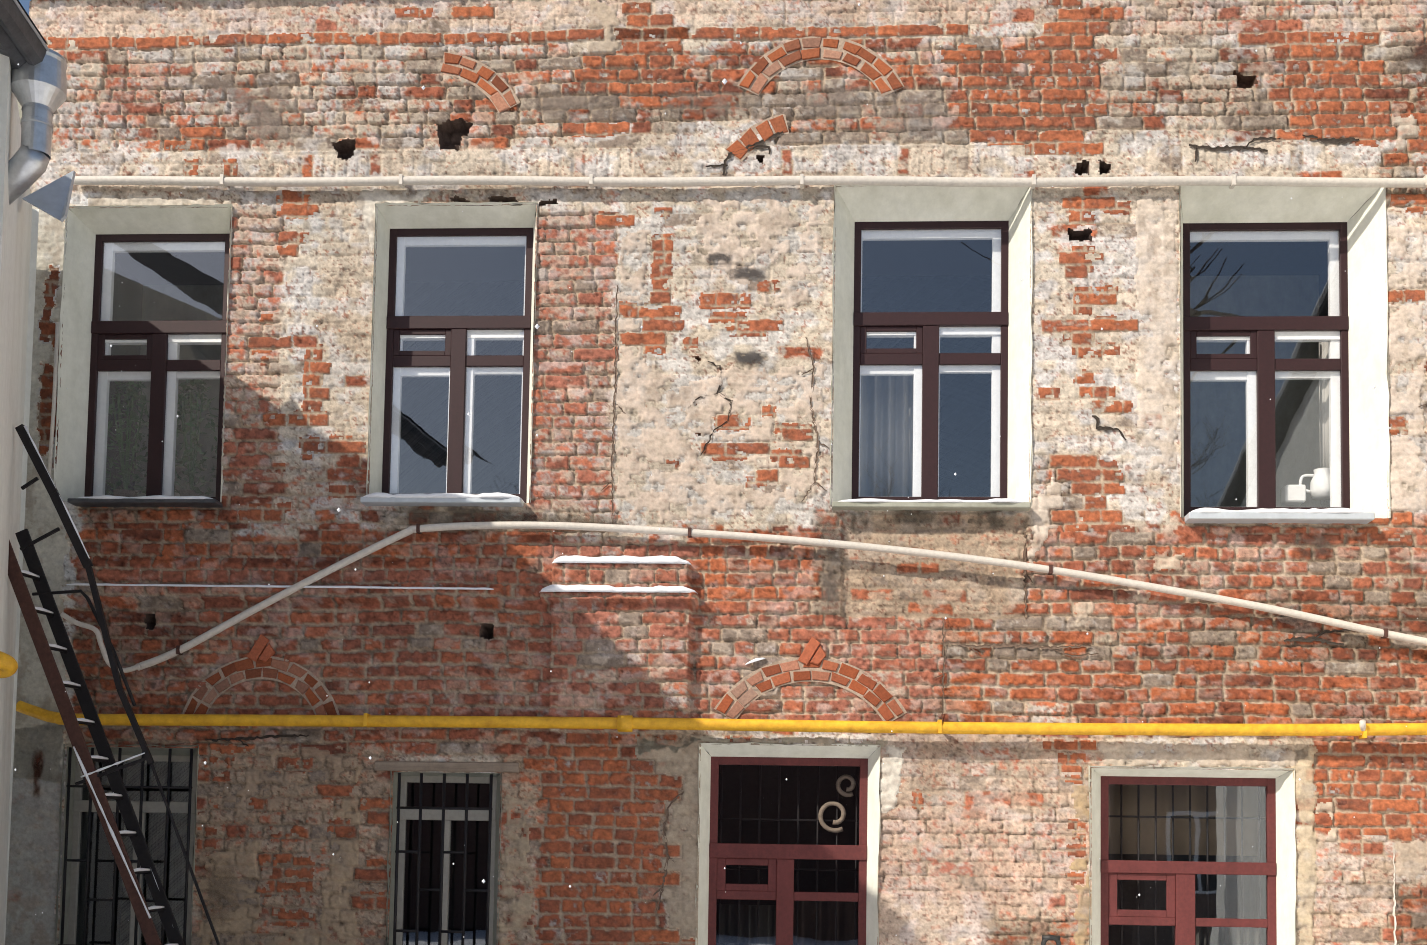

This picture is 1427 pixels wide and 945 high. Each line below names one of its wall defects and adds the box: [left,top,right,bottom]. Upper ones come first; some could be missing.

spalling [276,190,319,257]
spalling [47,0,1124,177]
crack [706,131,783,175]
crack [1189,135,1359,162]
spalling [1237,31,1427,154]
spalling [248,314,367,460]
flaking render [596,193,827,524]
crack [690,361,733,456]
crack [801,337,829,502]
flaking render [1038,195,1181,470]
spalling [1026,454,1130,563]
spalling [497,730,924,945]